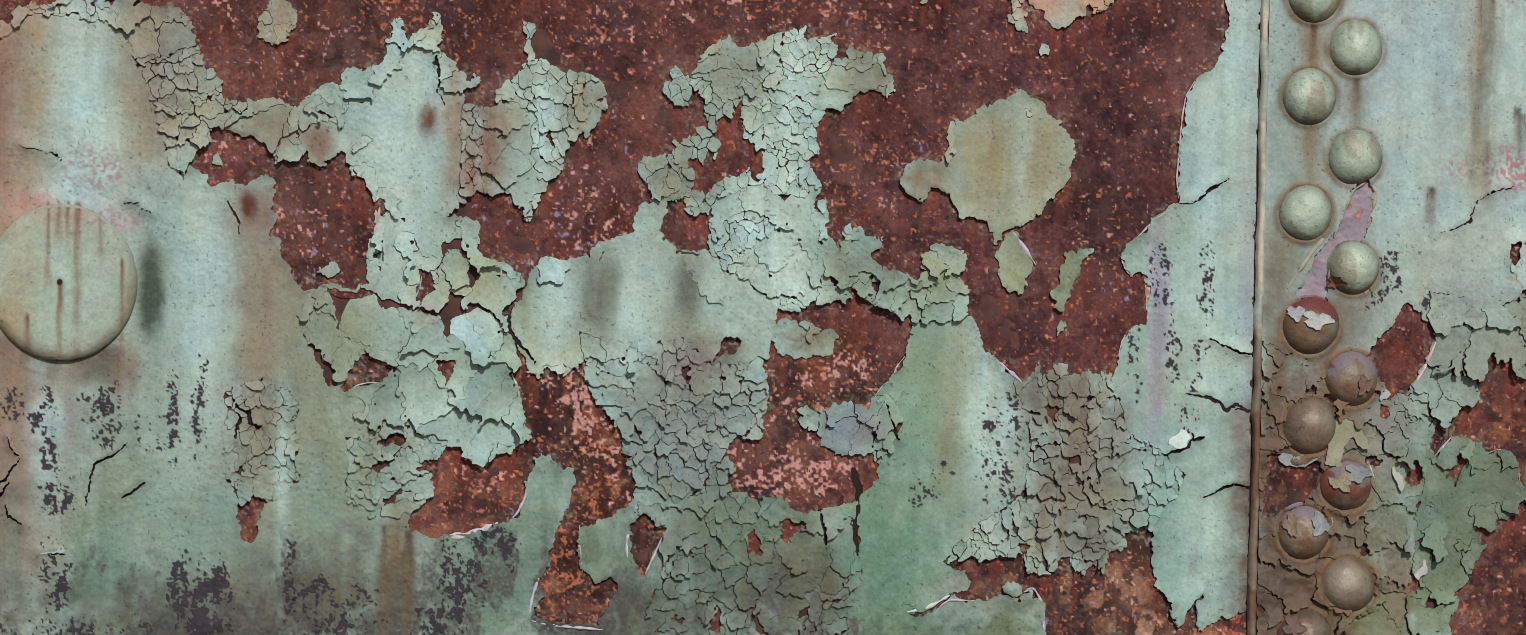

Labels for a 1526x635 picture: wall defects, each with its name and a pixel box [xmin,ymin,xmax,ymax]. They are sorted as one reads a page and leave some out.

water stain [0,385,79,515]
water stain [76,354,209,479]
crack [232,396,262,439]
peeling [0,0,969,635]
corrosion [133,0,1257,635]
peeling [868,0,1526,635]
crack [1162,393,1251,457]
crack [1203,483,1252,498]
corrosion [1368,302,1444,430]
corrosion [1357,352,1526,635]
water stain [166,549,239,635]
water stain [410,524,521,635]